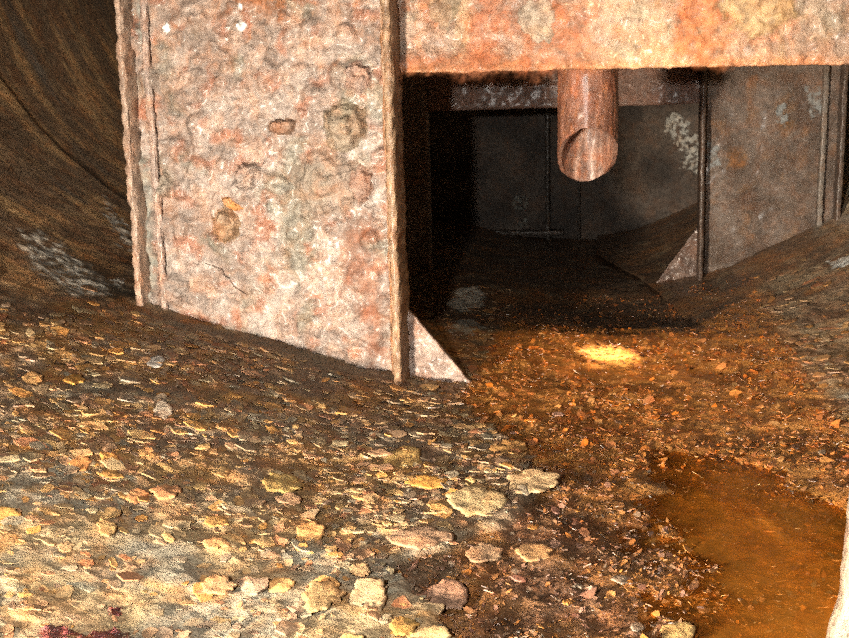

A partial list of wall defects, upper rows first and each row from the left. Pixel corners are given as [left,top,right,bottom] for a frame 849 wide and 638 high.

rust [403,0,530,71]
rust [675,0,725,59]
rust [268,117,297,135]
rust [285,60,374,220]
rust [155,169,174,198]
rust [234,162,262,191]
rust [212,197,244,244]
rust [0,230,849,638]